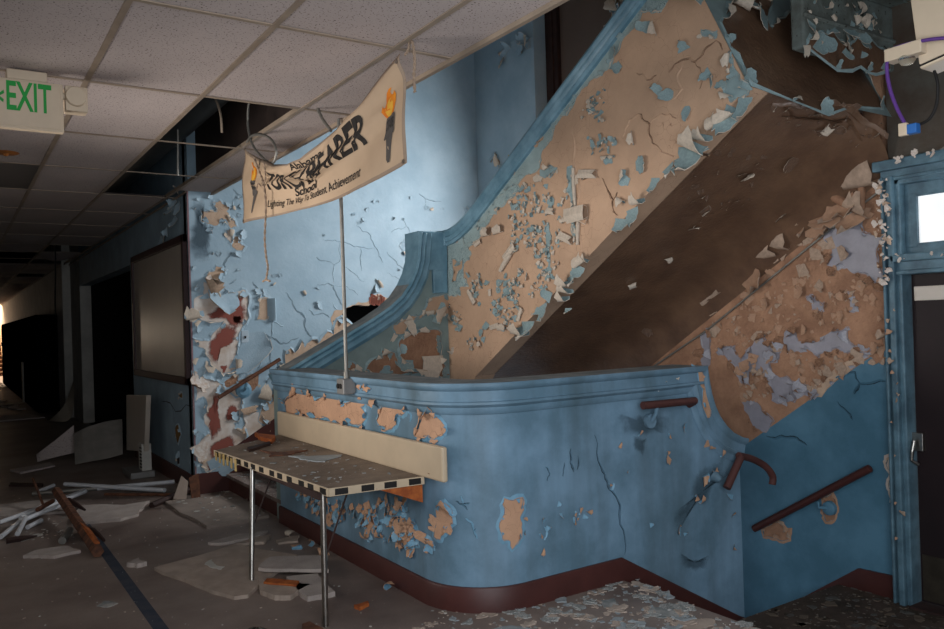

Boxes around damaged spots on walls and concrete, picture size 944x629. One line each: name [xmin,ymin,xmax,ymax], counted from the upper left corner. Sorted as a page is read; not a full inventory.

crack [622,40,723,157]
peeling [893,148,936,164]
crack [258,220,411,369]
peeling [158,0,905,476]
crack [546,435,626,552]
peeling [695,440,726,504]
peeling [761,520,792,544]
peeling [820,492,839,524]